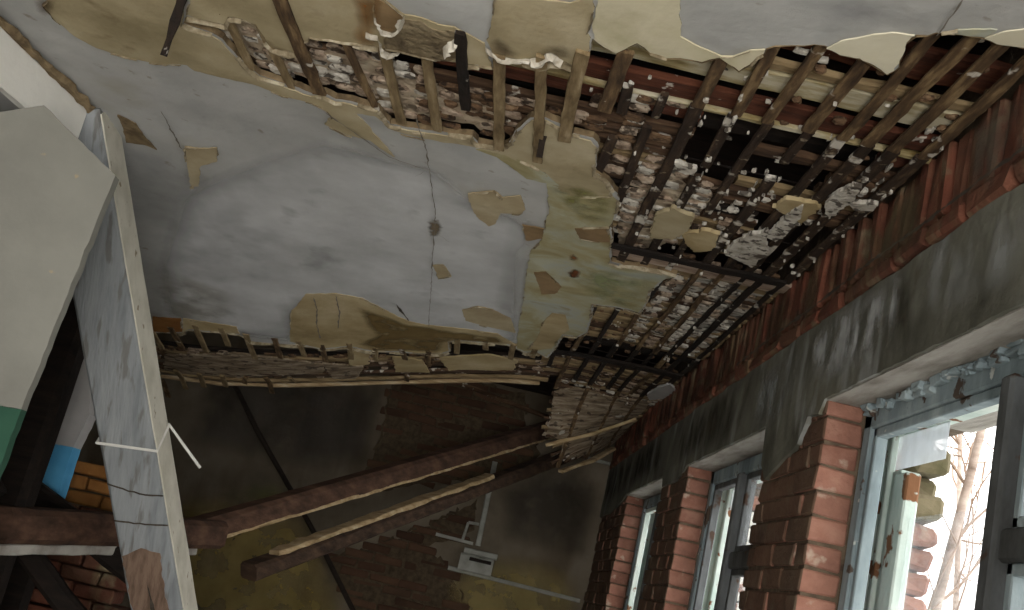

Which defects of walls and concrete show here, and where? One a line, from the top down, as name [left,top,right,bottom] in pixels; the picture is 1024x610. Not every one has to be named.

crack [326,113,449,327]
spalling [42,0,1024,400]
damp [816,286,909,373]
peeling [860,339,1024,417]